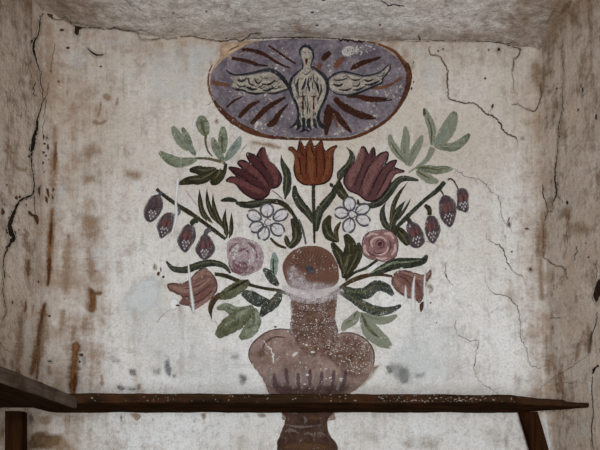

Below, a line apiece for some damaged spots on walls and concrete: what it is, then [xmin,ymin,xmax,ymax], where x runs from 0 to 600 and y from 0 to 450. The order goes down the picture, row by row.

crack [1,12,73,321]
crack [454,168,526,284]
corrosion [16,301,48,379]
corrosion [69,288,102,394]
crack [485,276,543,369]